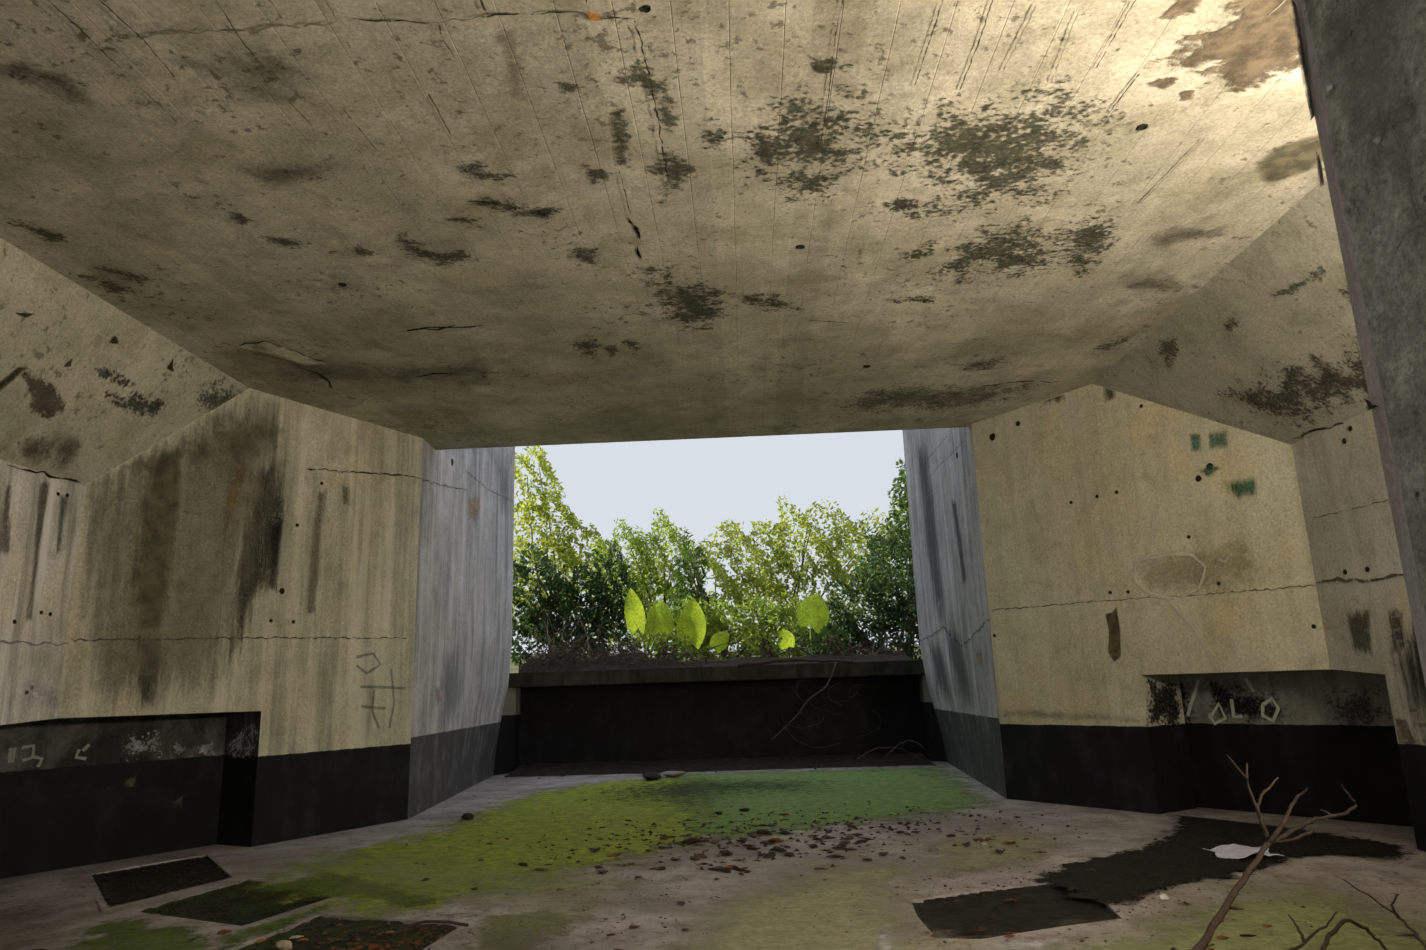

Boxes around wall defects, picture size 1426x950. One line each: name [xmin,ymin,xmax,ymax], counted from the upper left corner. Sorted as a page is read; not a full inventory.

crack [135,11,669,181]
leakage [609,63,681,132]
leakage [448,161,561,224]
leakage [583,110,697,207]
leakage [701,58,1126,284]
leakage [641,265,805,331]
leakage [22,372,66,419]
leakage [1218,340,1369,429]
leakage [94,377,284,704]
crack [918,574,1404,647]
leakage [1348,611,1371,653]
leakage [1390,610,1426,739]